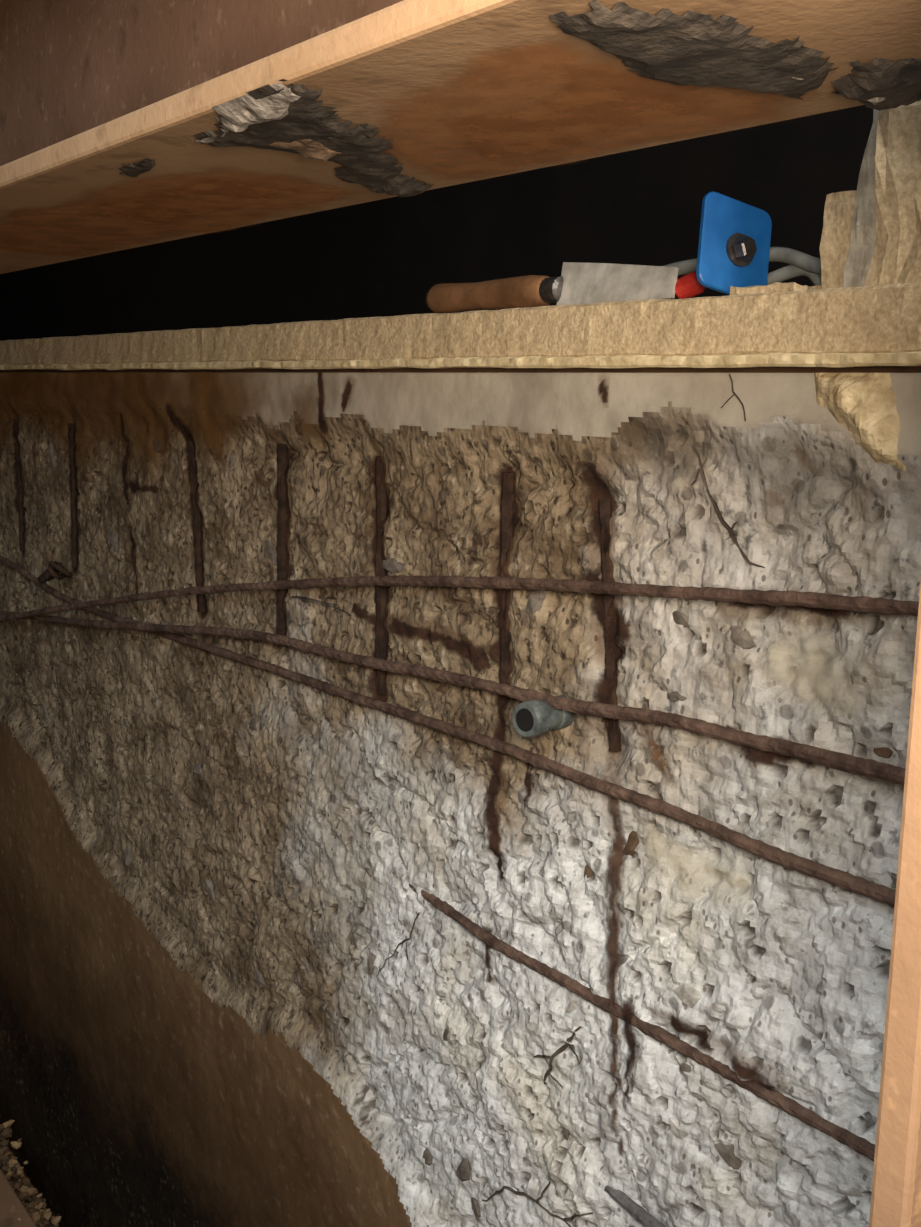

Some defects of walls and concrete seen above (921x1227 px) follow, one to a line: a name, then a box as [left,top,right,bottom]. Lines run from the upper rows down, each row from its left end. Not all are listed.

peeling [548,0,921,110]
peeling [193,79,434,198]
corrosion [583,467,617,553]
crack [691,441,765,568]
corrosion [352,457,511,880]
corrosion [575,570,630,731]
spalling [0,401,921,1227]
corrosion [745,737,816,766]
corrosion [605,797,636,1156]
corrosion [670,1015,714,1051]
damp [0,977,216,1227]
crack [482,1181,593,1227]